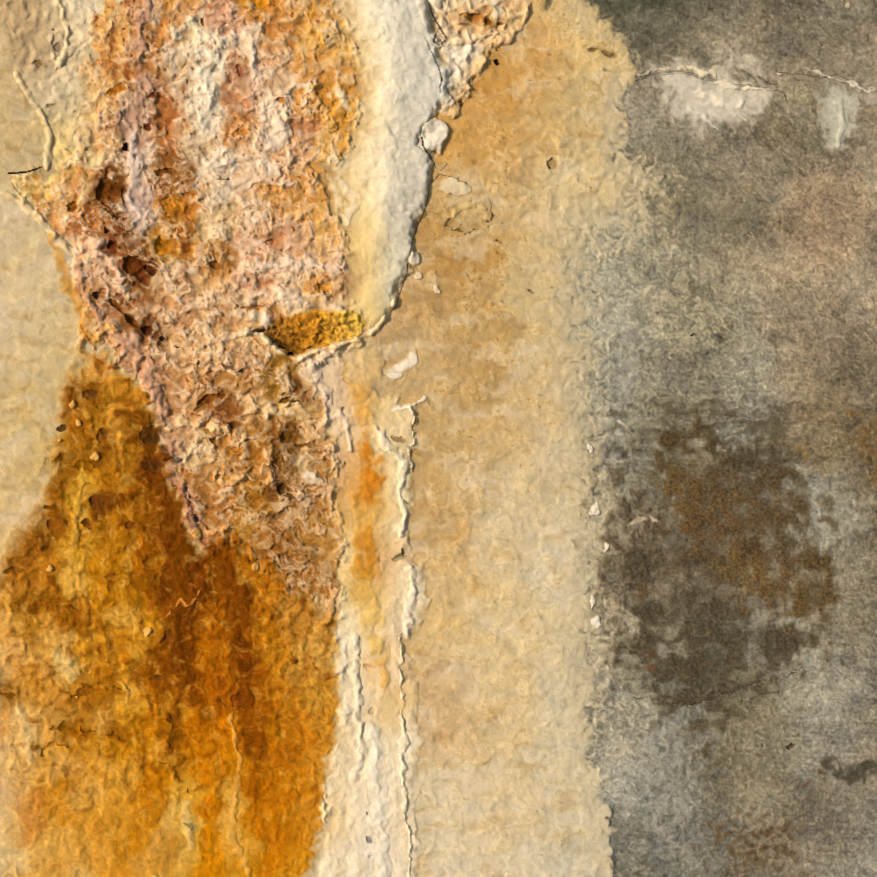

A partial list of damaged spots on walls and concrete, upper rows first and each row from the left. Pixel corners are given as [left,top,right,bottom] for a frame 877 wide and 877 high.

corrosion [0,232,339,877]
spalling [0,0,364,611]
corrosion [338,359,393,694]
leakage [551,0,877,270]
leakage [565,254,877,877]
crack [781,51,845,79]